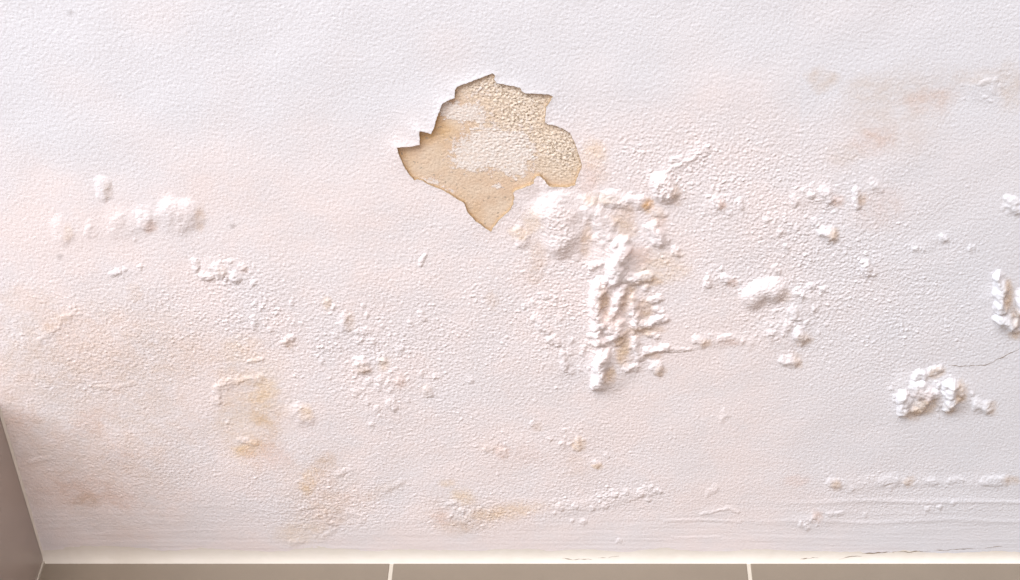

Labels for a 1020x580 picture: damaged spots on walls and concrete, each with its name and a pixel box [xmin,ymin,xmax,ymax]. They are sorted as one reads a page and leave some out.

peeling [397,73,582,232]